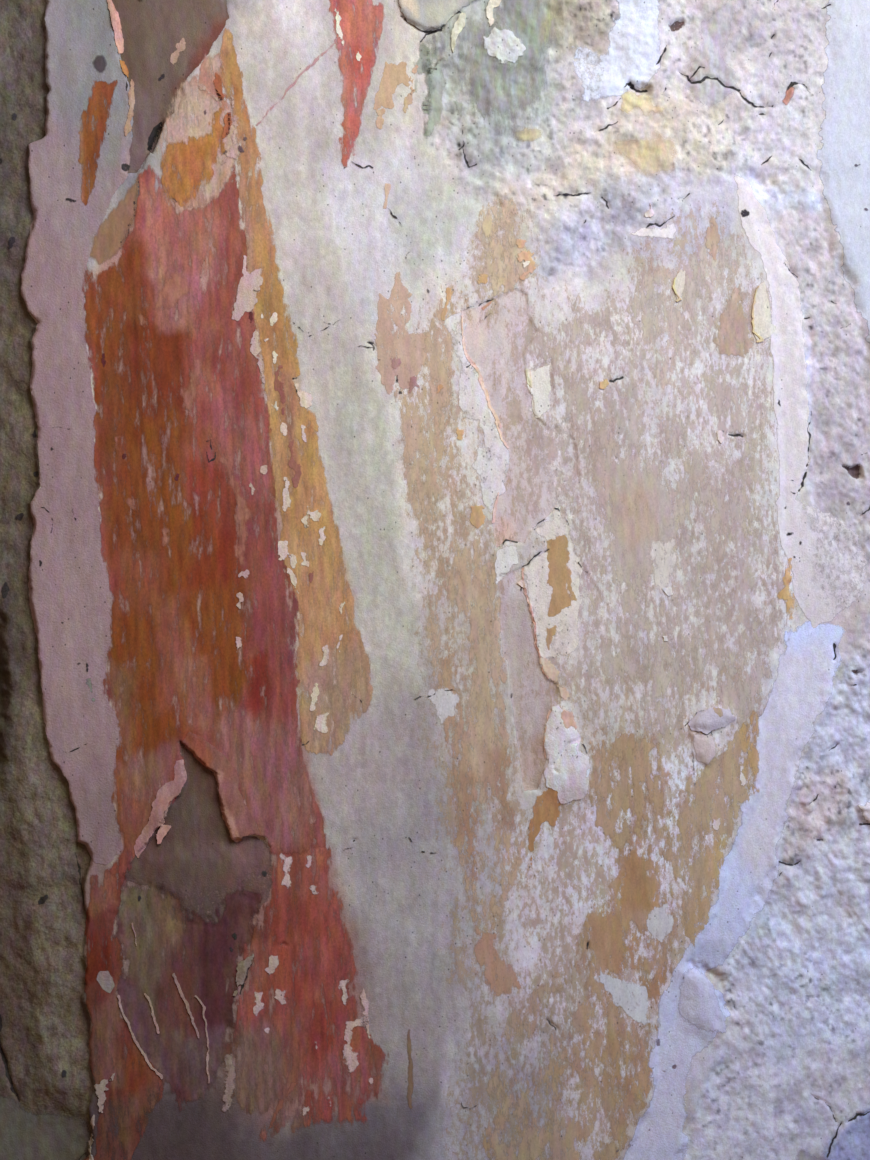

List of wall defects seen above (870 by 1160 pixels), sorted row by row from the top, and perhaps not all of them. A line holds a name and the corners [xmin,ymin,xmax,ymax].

leakage [417,0,561,140]
leakage [622,92,663,115]
crack [599,45,807,131]
leakage [687,4,736,105]
leakage [618,138,673,173]
spalling [751,282,776,343]
spalling [444,288,583,791]
spalling [0,0,273,1159]
peeling [428,688,459,723]
peeling [647,904,674,943]
peeling [594,968,650,1025]
crack [814,1097,870,1158]